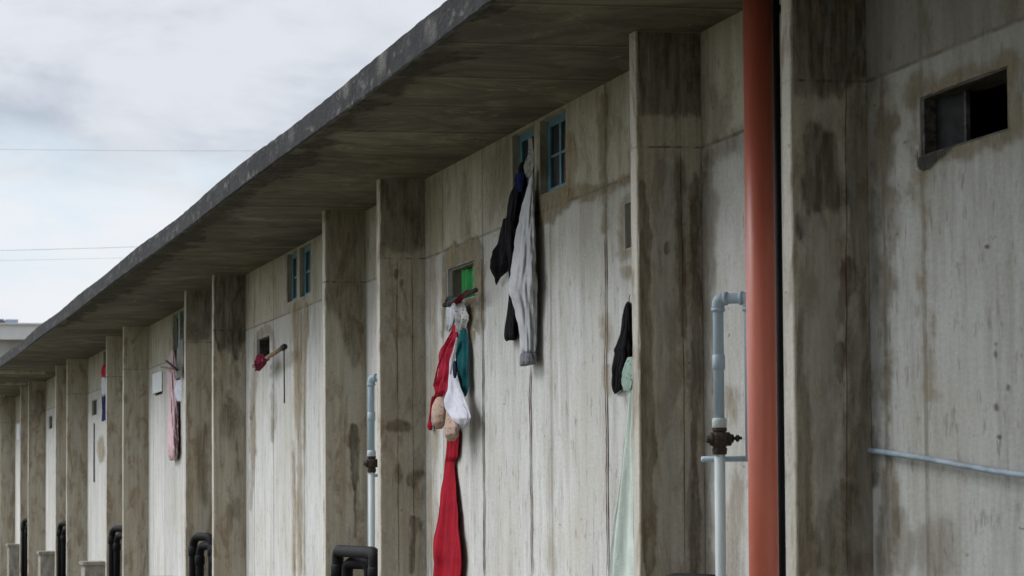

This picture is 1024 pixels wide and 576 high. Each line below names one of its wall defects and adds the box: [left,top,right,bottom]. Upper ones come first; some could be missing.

damp [793,0,866,97]
damp [58,34,477,327]
damp [349,424,358,504]